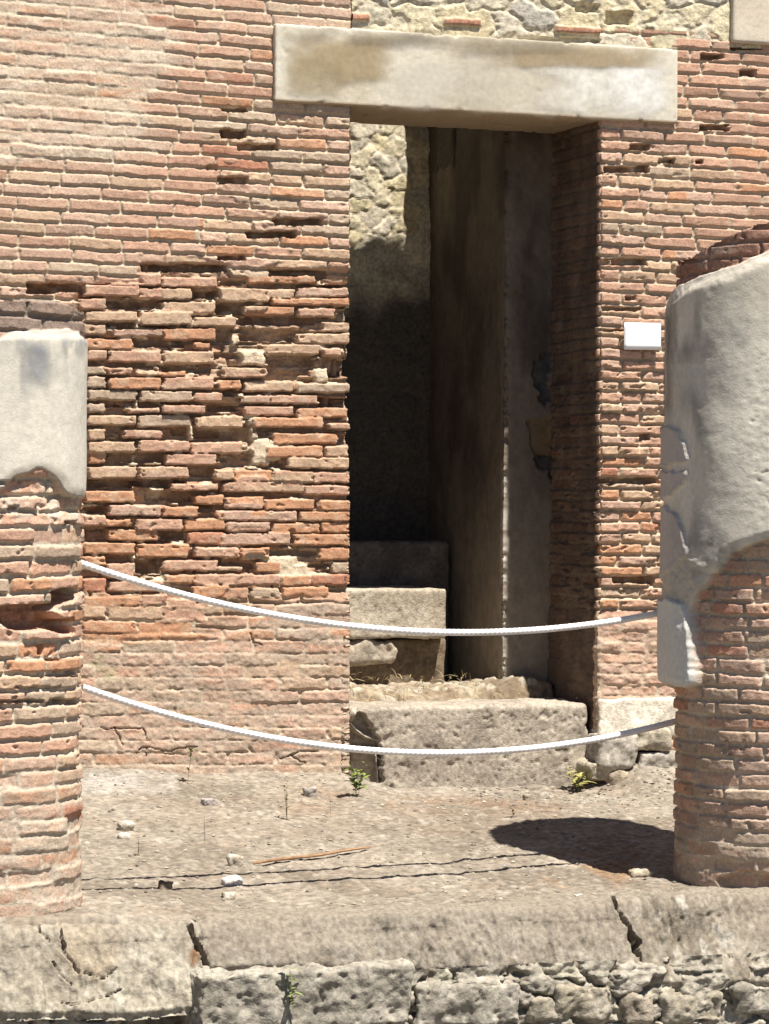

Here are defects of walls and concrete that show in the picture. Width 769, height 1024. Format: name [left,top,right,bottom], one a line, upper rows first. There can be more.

spalling [219,129,280,152]
spalling [206,165,249,186]
spalling [245,219,323,239]
spalling [0,256,350,633]
spalling [741,363,769,531]
crack [39,924,67,967]
crack [186,923,209,966]
crack [627,929,643,962]